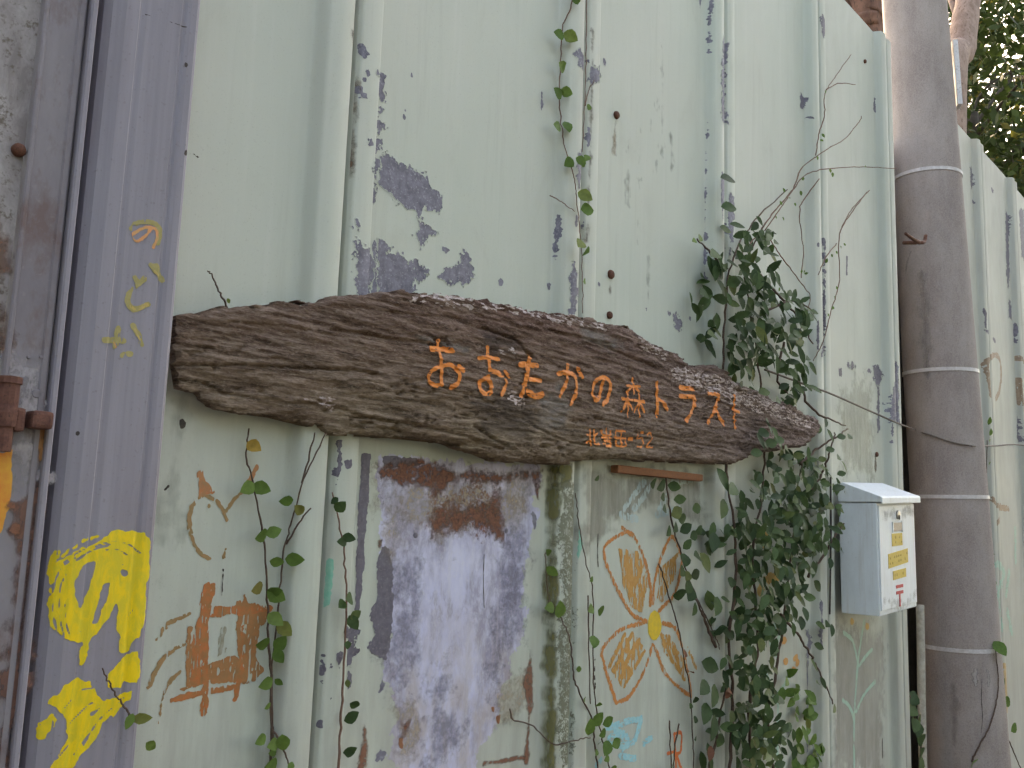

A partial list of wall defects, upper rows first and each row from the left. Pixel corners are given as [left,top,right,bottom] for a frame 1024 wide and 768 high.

peeling [350,43,475,295]
peeling [319,440,542,768]
corrosion [379,458,543,542]